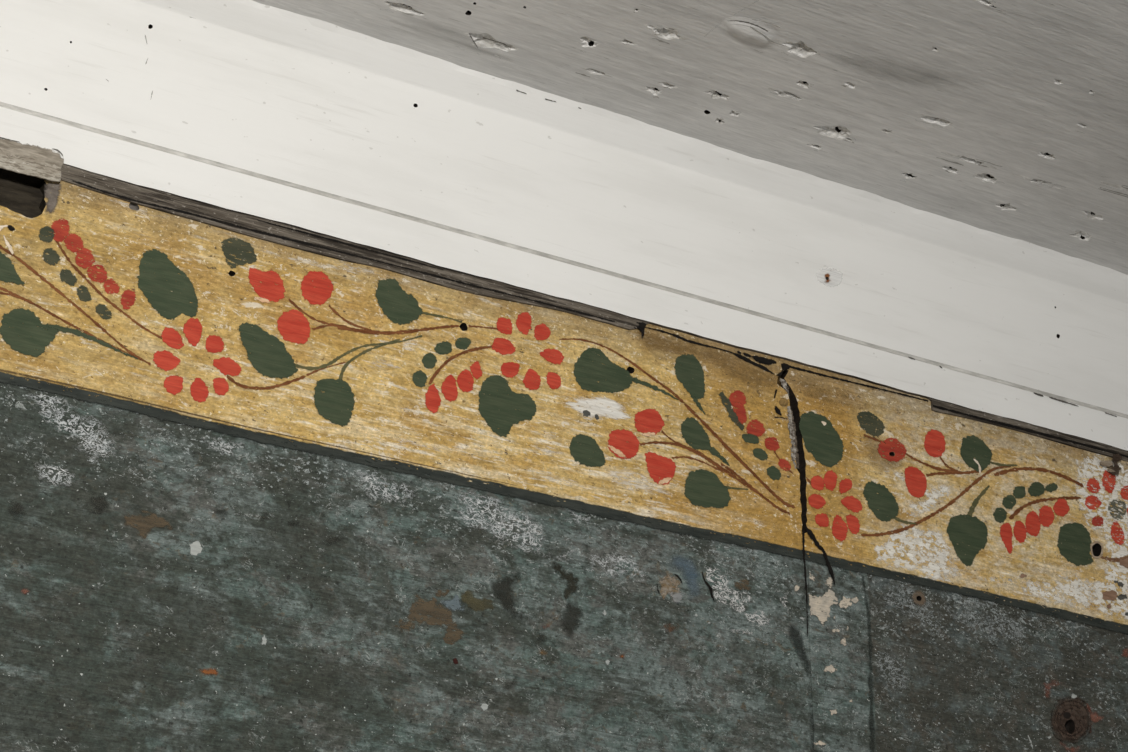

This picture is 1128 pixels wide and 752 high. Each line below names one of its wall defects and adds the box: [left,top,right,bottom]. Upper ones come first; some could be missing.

crack [72,180,1128,636]
peeling [702,568,769,634]
peeling [780,573,858,668]
crack [863,576,875,752]